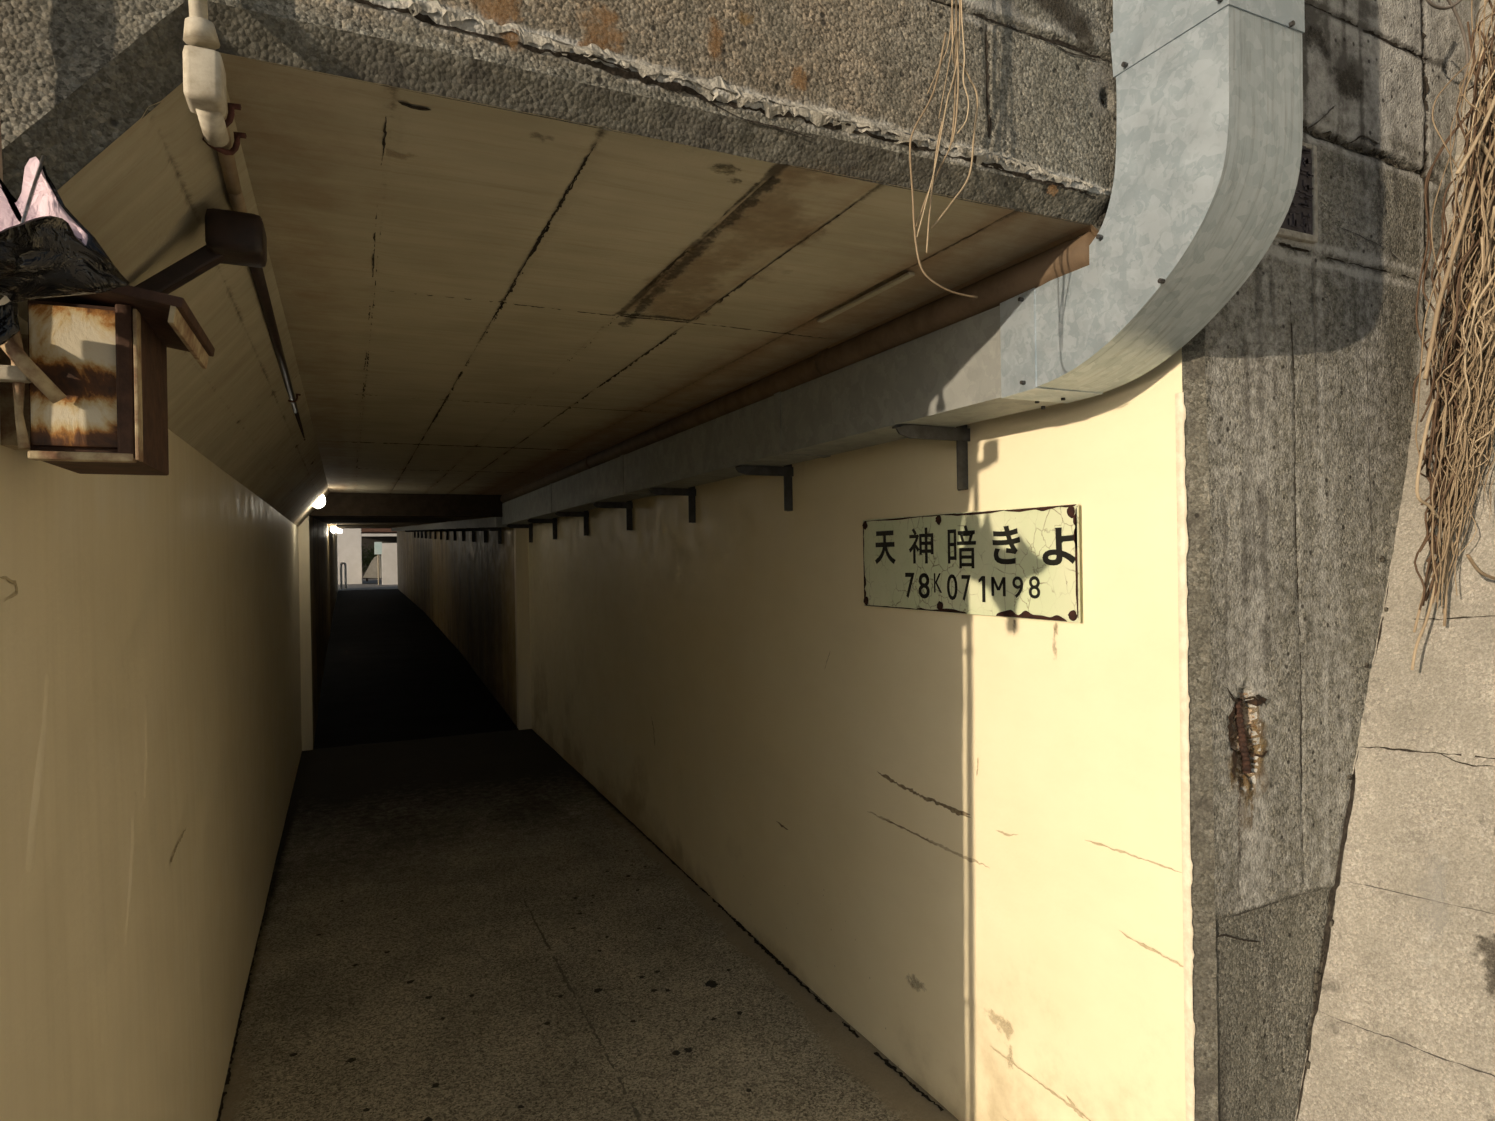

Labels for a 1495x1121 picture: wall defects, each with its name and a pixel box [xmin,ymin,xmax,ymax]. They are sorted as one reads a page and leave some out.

corrosion [479,0,519,48]
crack [354,0,1110,201]
damp [618,165,780,327]
crack [1289,297,1302,790]
crack [1364,427,1489,668]
crack [1214,747,1495,1121]
damp [1479,935,1495,994]